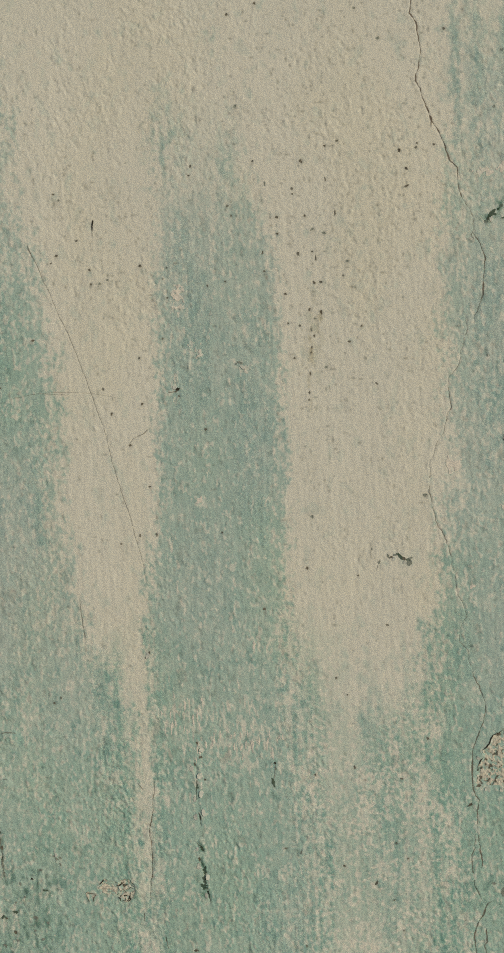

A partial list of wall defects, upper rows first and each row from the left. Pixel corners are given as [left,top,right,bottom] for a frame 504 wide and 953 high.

crack [409,0,504,953]
spalling [476,728,504,792]